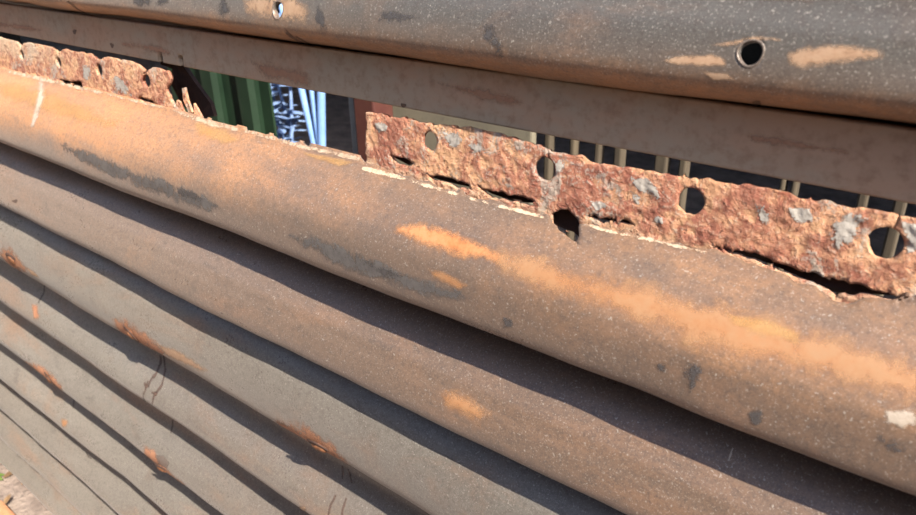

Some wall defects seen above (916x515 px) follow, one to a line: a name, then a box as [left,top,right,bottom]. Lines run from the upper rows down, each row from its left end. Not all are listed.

rust [246,0,306,20]
rust [469,197,544,218]
crack [717,246,900,296]
rust [398,225,916,388]
rust [115,319,202,370]
rust [144,448,183,484]